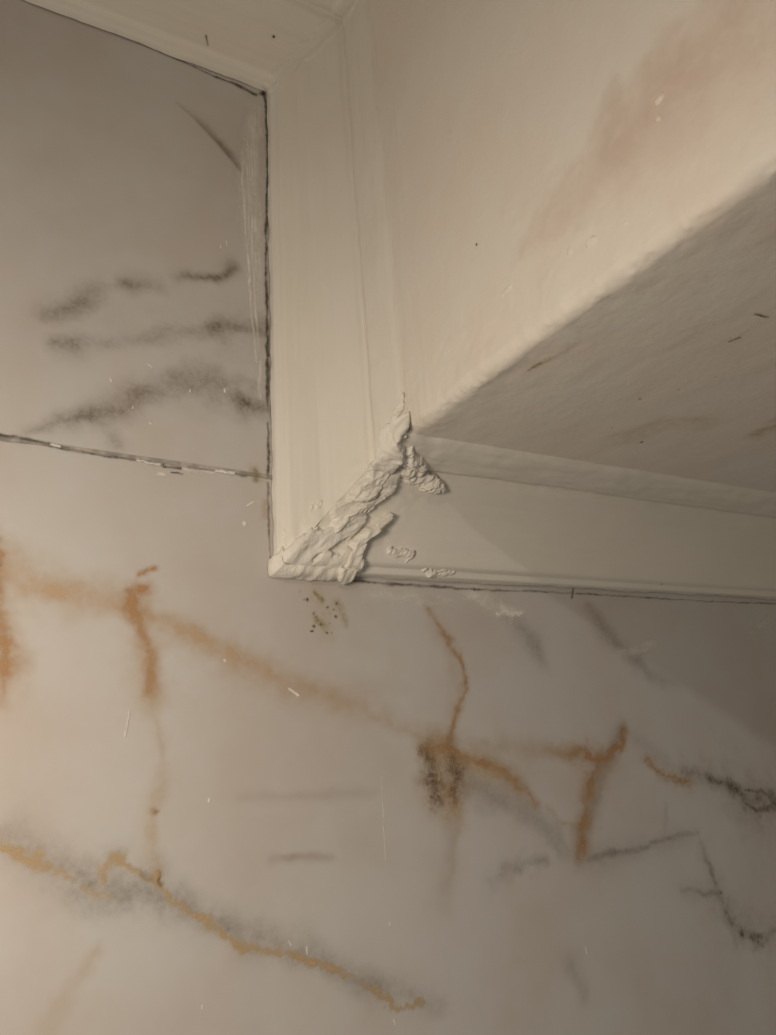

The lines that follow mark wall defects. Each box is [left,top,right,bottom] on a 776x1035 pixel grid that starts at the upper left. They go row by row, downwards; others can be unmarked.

peeling [396,446,446,494]